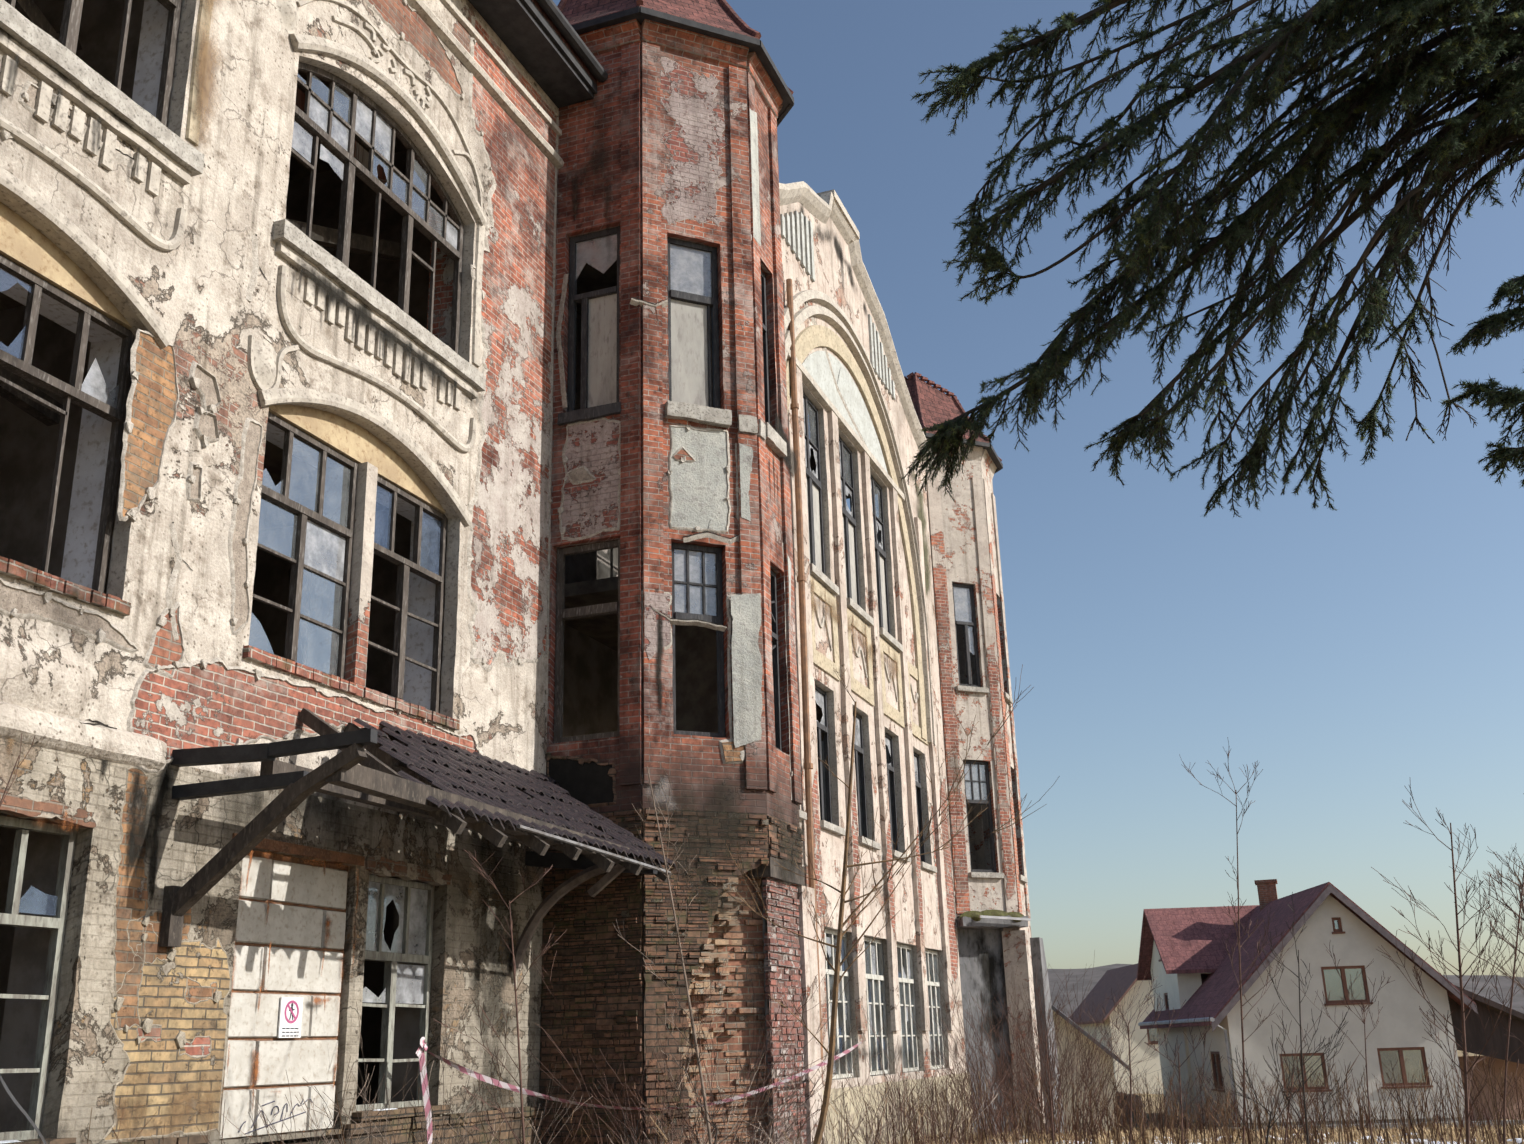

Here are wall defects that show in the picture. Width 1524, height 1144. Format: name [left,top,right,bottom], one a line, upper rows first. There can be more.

peeling [660,57,728,226]
spalling [117,329,221,522]
spalling [364,0,621,672]
spalling [228,418,263,635]
crack [64,715,117,729]
leakage [127,757,170,897]
spalling [0,577,480,1142]
leakage [657,780,742,908]
peeling [782,543,793,800]
leakage [781,816,803,881]
spalling [802,770,829,922]
spalling [911,584,969,987]